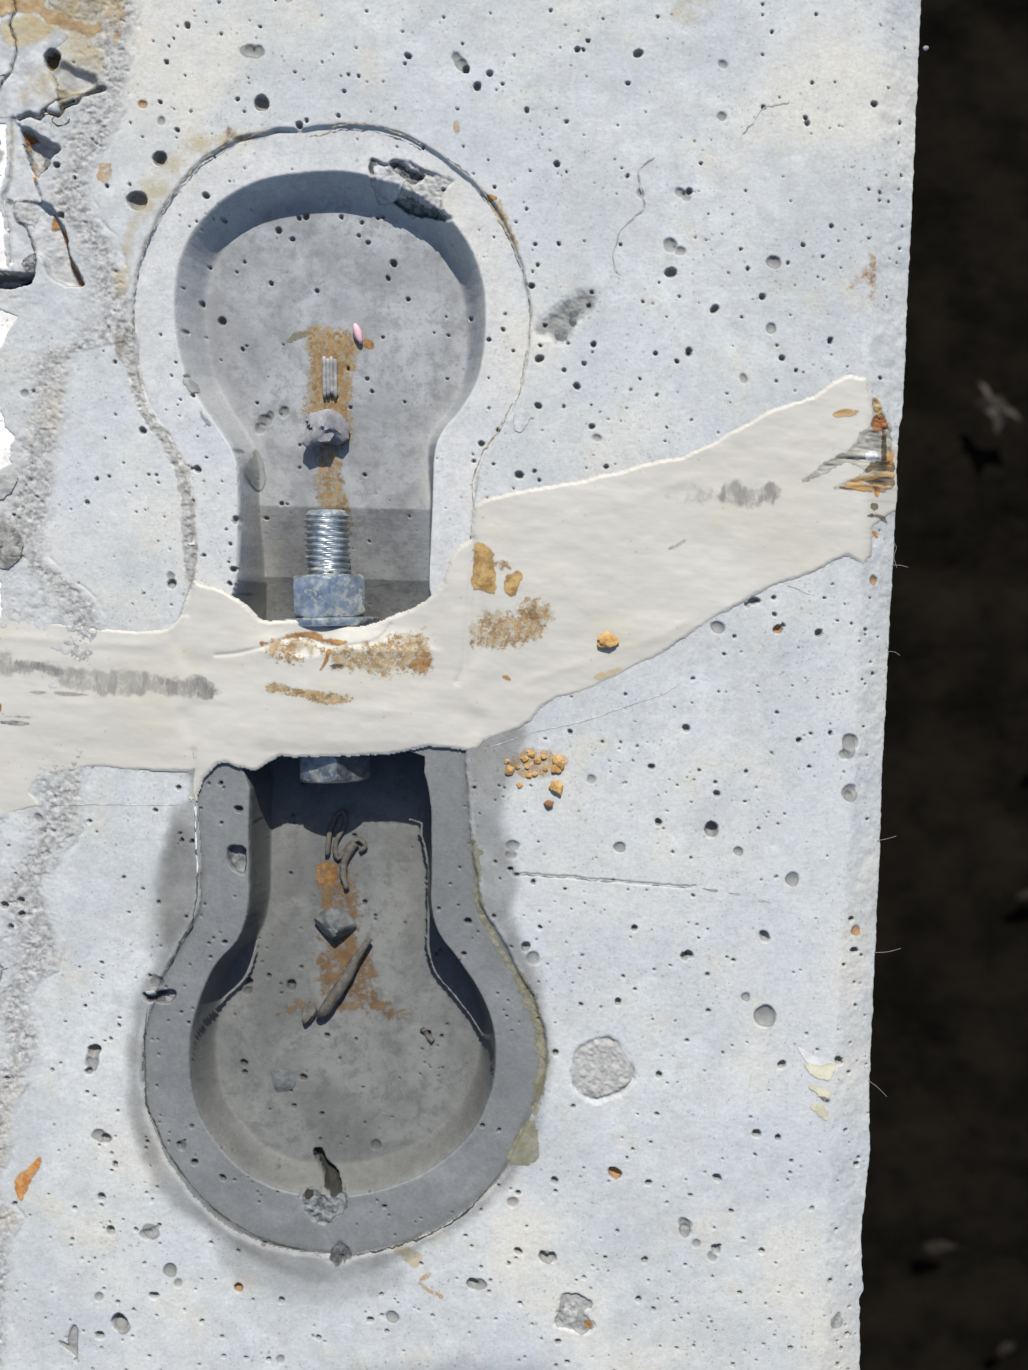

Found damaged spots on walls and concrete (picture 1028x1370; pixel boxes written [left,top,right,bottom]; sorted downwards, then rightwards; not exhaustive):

crack [0,0,17,87]
crack [20,90,100,126]
spalling [0,0,104,287]
spalling [368,160,453,222]
corrosion [287,325,374,528]
spalling [802,397,895,523]
corrosion [260,631,432,677]
corrosion [266,682,353,705]
corrosion [510,748,567,778]
corrosion [316,861,402,1019]
corrosion [14,1157,42,1201]
spalling [60,1325,78,1356]